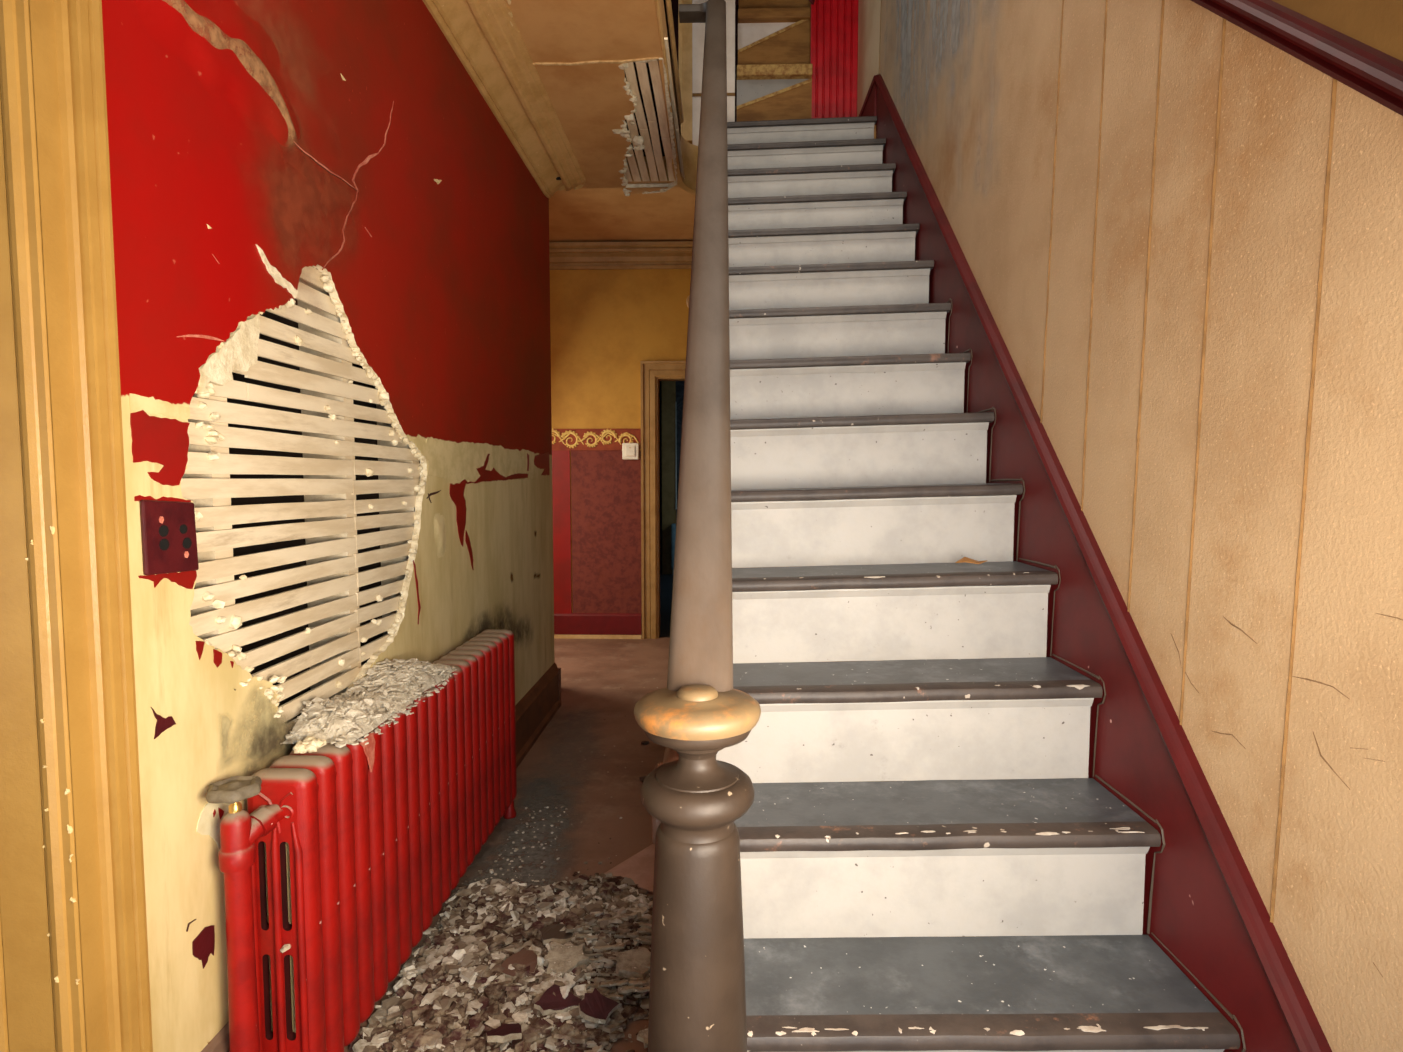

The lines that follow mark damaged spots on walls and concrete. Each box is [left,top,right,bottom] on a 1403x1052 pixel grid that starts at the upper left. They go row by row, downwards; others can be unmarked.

spalling [612,61,670,158]
crack [293,101,394,270]
spalling [129,244,427,731]
peeling [465,531,474,570]
leakage [222,691,287,763]